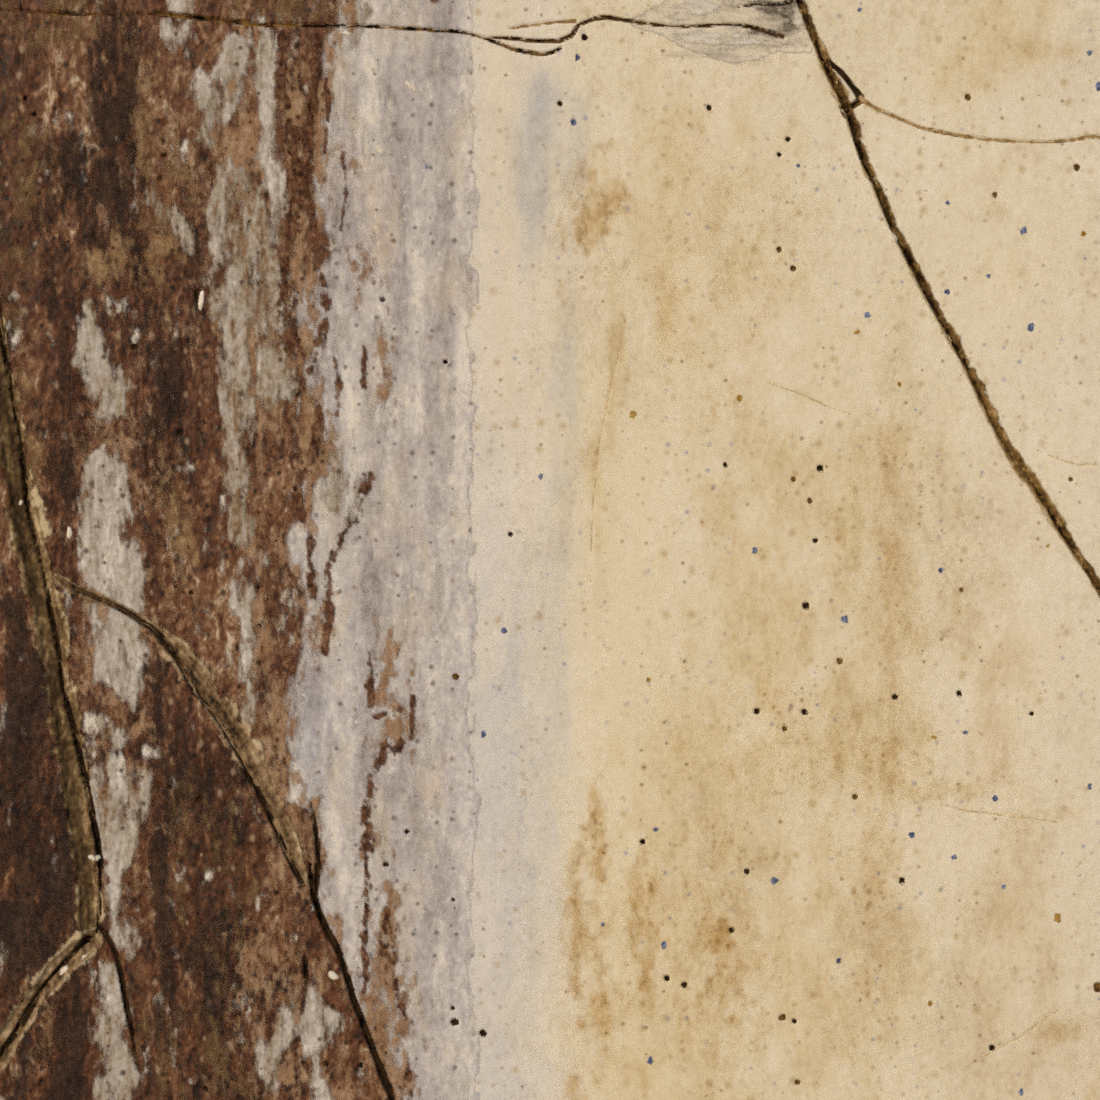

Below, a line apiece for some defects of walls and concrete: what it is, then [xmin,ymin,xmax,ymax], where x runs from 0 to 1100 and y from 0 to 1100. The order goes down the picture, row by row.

crack [0,305,396,1100]
rust [0,0,421,1100]
crack [4,0,1100,598]
spalling [630,0,813,64]
peeling [255,986,345,1100]